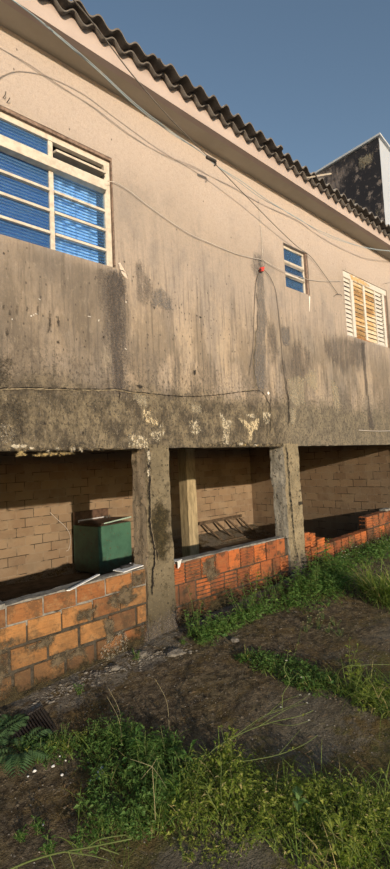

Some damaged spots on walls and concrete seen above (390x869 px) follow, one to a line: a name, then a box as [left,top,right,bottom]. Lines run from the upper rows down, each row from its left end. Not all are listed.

damp [108,271,124,389]
crack [0,299,290,431]
damp [220,412,271,444]
damp [252,256,266,390]
damp [361,343,374,428]
crack [148,448,158,595]
crack [286,445,299,560]